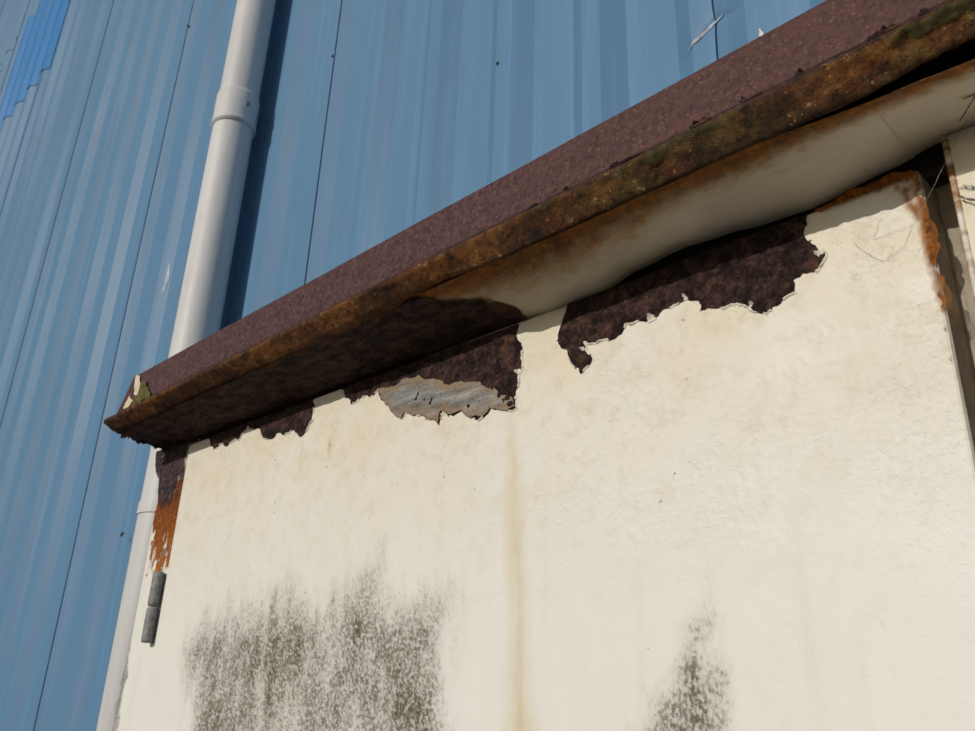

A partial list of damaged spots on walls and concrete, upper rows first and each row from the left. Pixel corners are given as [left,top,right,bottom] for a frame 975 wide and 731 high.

corrosion [118,59,975,576]